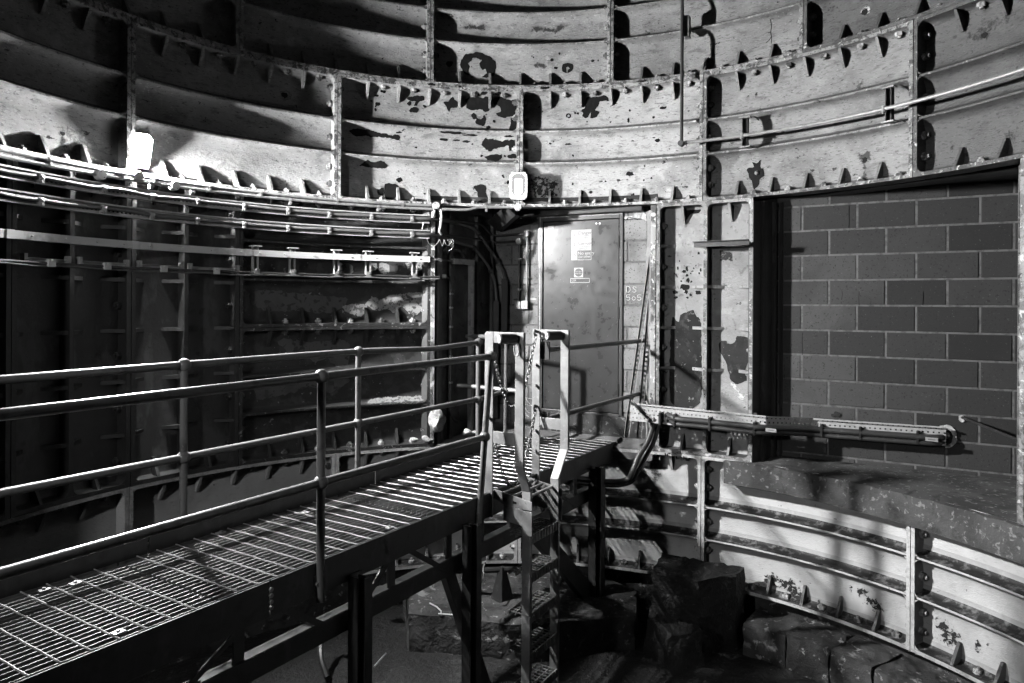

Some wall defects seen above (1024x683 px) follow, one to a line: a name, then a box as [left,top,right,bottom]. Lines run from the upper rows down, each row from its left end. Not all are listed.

peeling [407,83,435,113]
peeling [437,52,517,162]
peeling [566,94,612,123]
peeling [669,252,703,408]
peeling [719,336,748,384]